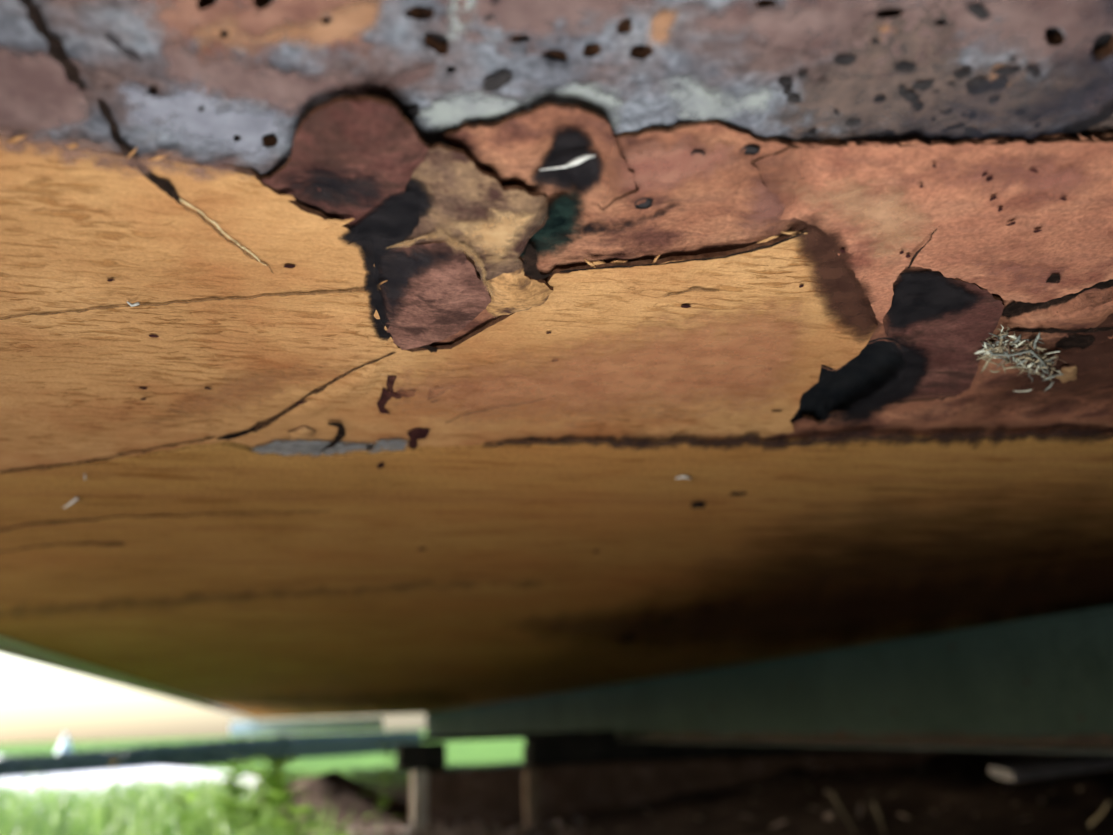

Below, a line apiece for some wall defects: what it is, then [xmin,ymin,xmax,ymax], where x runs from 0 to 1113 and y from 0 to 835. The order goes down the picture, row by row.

water stain [449,0,475,39]
water stain [668,4,1113,141]
water stain [0,85,284,179]
spalling [403,107,420,121]
water stain [419,83,622,131]
peeling [1054,364,1077,383]
crack [0,345,438,474]
peeling [252,426,408,457]
crack [0,510,331,553]